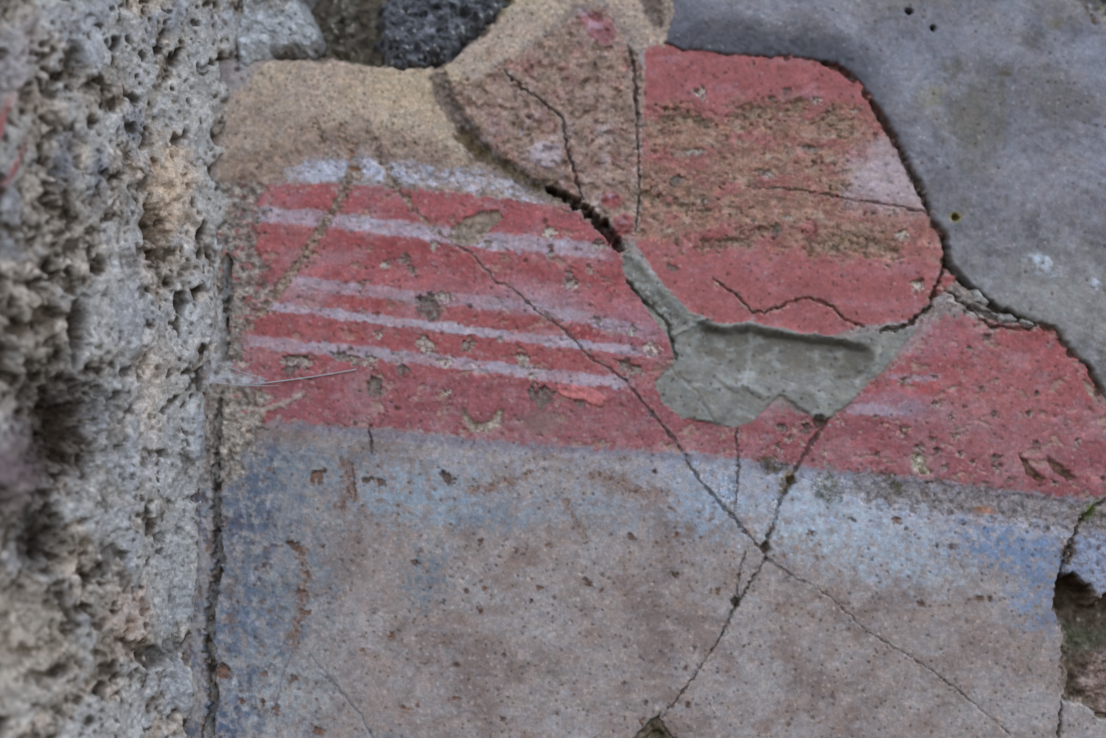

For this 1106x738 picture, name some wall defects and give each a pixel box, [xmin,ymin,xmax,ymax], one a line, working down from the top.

spalling [1075,0,1106,28]
crack [504,40,680,364]
crack [745,186,935,219]
spalling [203,0,938,488]
crack [712,259,999,334]
crack [368,422,376,457]
crack [494,281,1014,738]
spalling [846,426,1091,538]
crack [1057,561,1070,579]